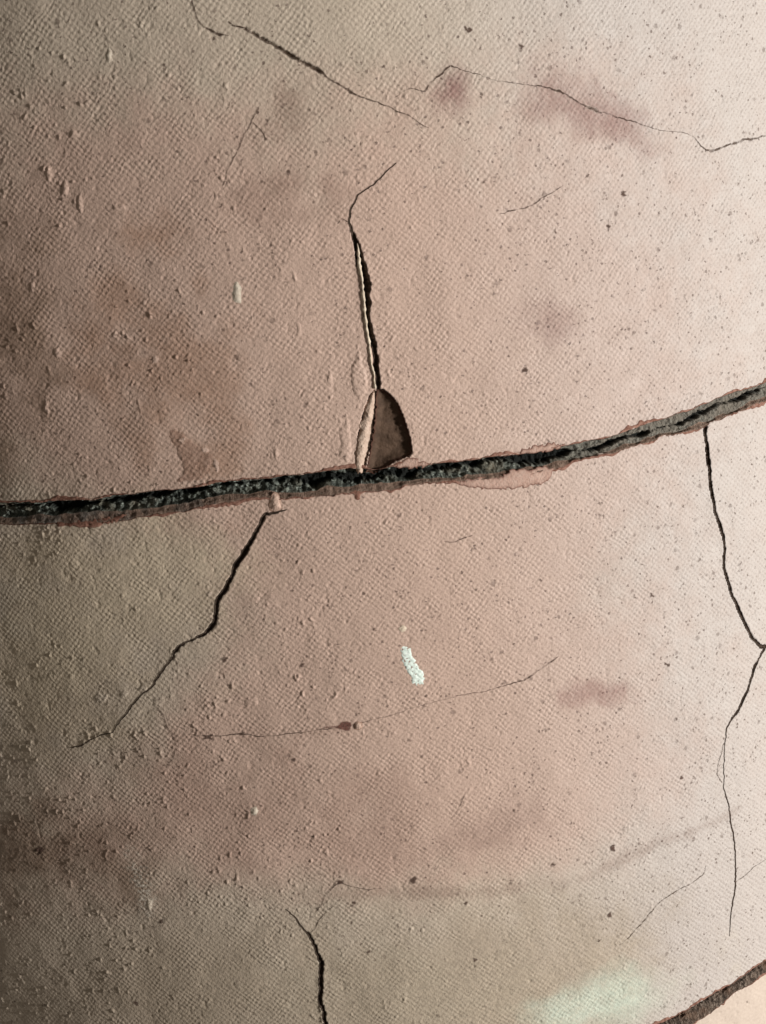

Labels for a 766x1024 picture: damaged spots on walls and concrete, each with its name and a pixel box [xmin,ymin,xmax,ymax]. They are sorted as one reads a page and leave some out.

crack [191,0,762,151]
crack [338,163,396,390]
peeling [355,389,413,474]
crack [0,378,766,936]
crack [286,883,382,1024]
crack [652,959,766,1024]